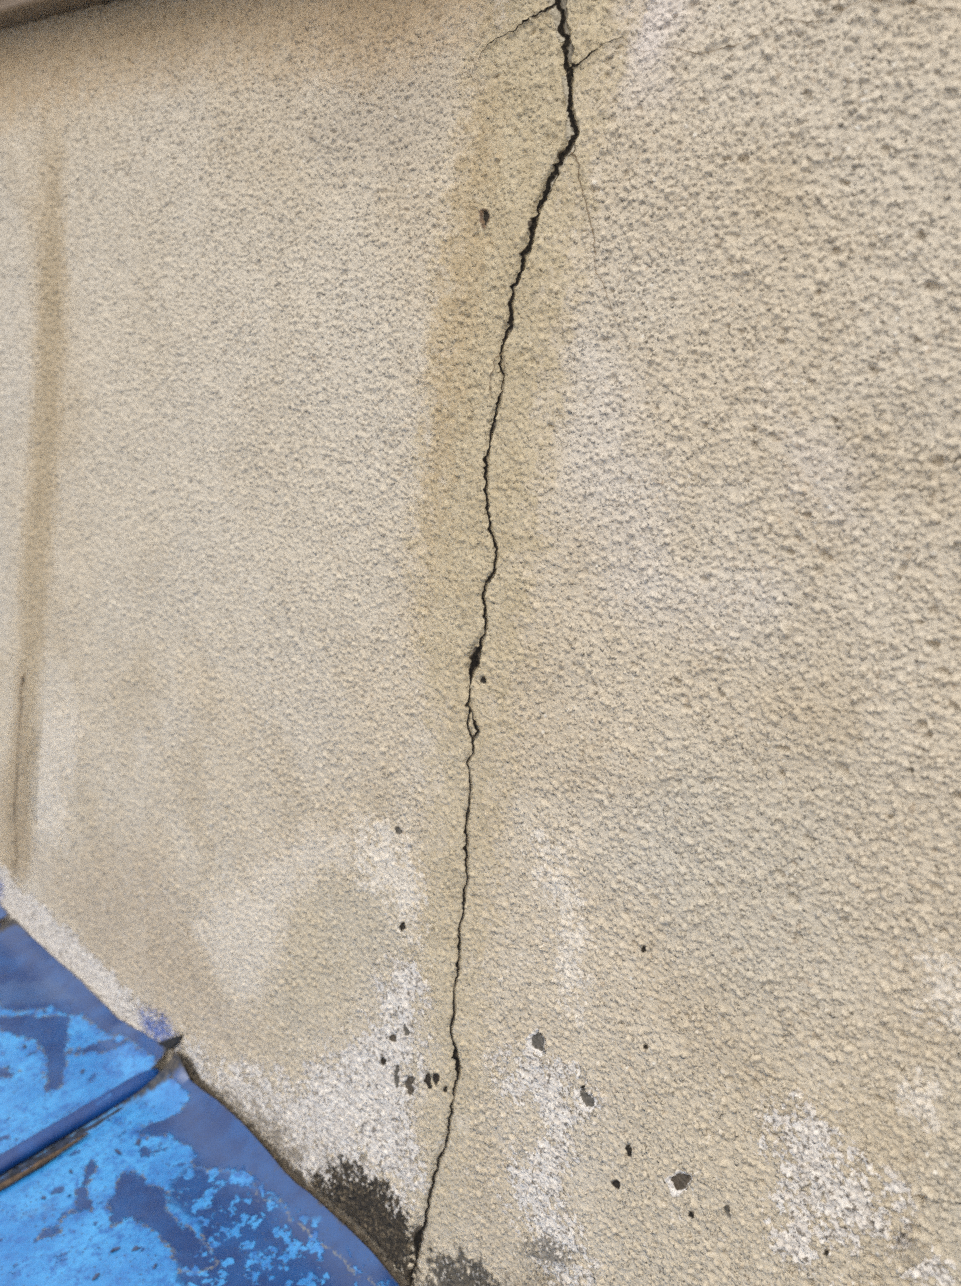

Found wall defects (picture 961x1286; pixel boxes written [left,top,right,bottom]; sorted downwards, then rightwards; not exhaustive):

damp [206,1079,592,1286]
crack [409,0,958,1286]